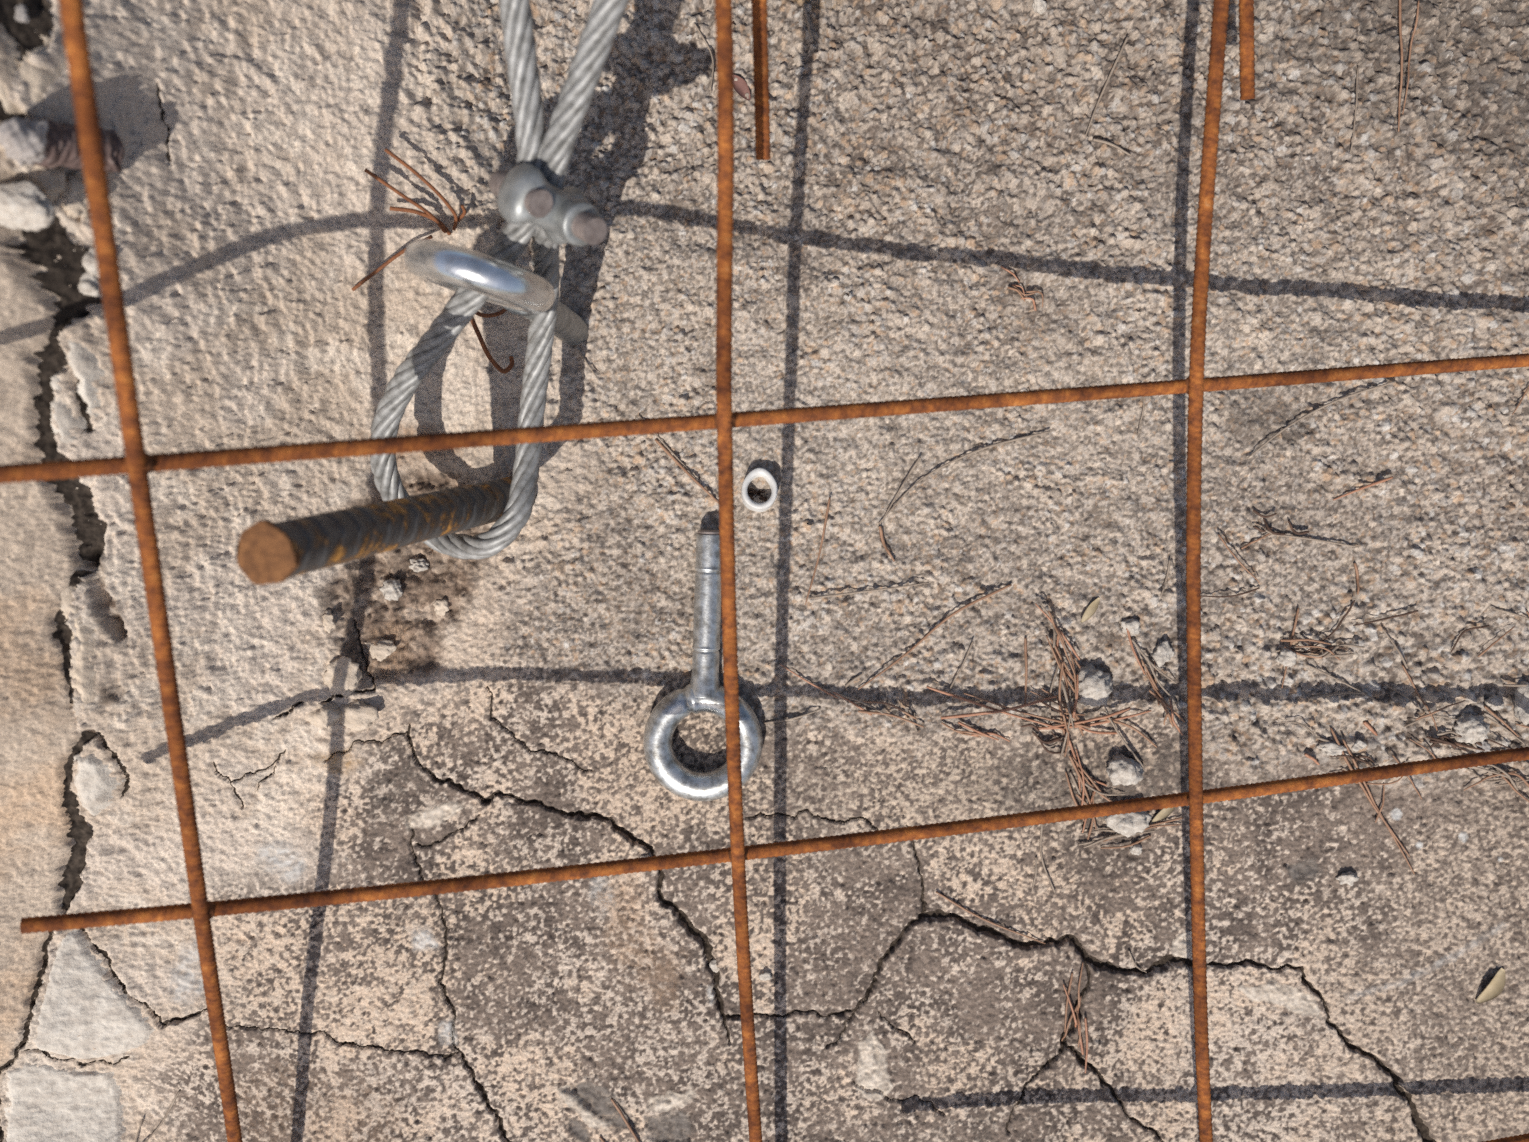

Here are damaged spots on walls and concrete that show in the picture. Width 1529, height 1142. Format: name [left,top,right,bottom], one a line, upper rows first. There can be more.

spalling [0,181,56,232]
peeling [50,340,105,443]
rust [0,0,1186,1142]
rust [745,0,1529,1142]
peeling [73,753,126,816]
crack [0,216,1436,1142]
peeling [4,930,155,1142]